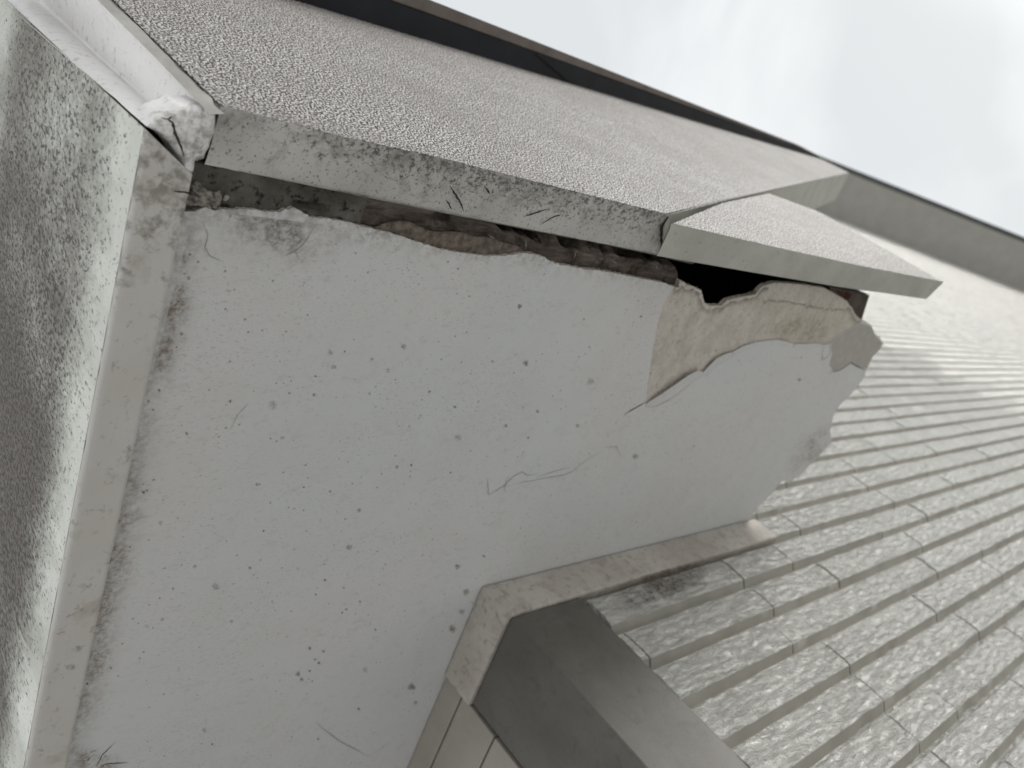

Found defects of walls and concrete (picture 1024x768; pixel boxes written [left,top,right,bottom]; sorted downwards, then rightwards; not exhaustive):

peeling [646,280,882,408]